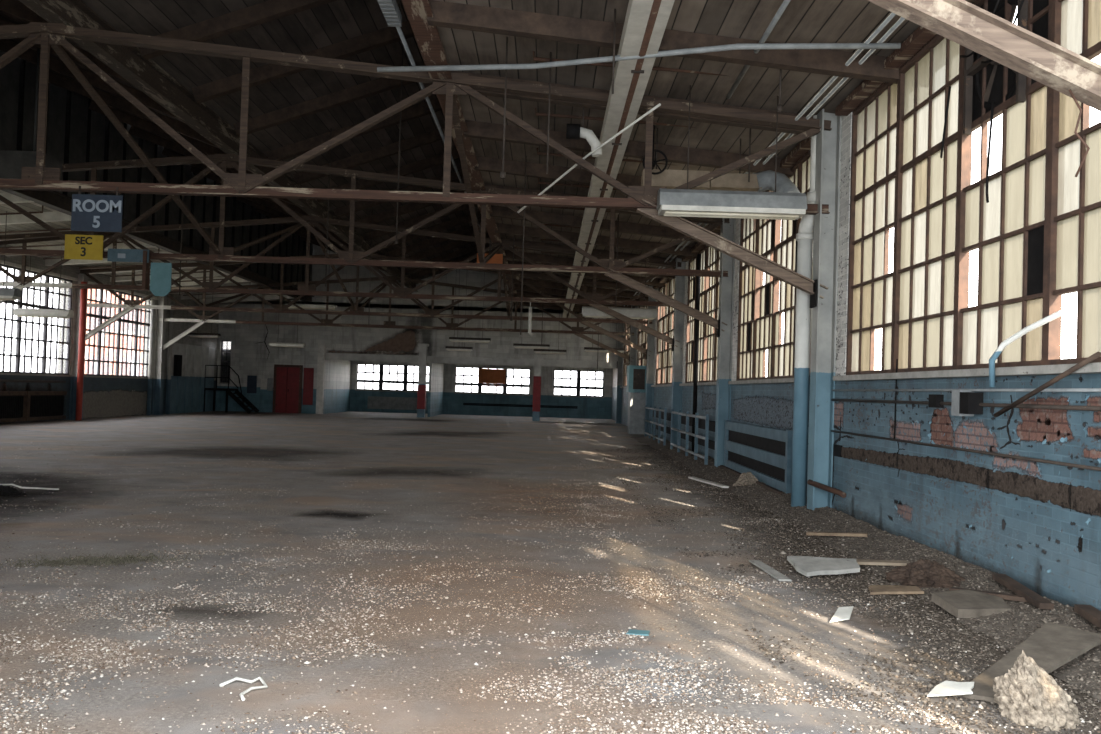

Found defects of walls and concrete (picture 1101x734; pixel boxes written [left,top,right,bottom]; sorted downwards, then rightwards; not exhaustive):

spalling [833,386,1101,552]
crack [997,395,1020,449]